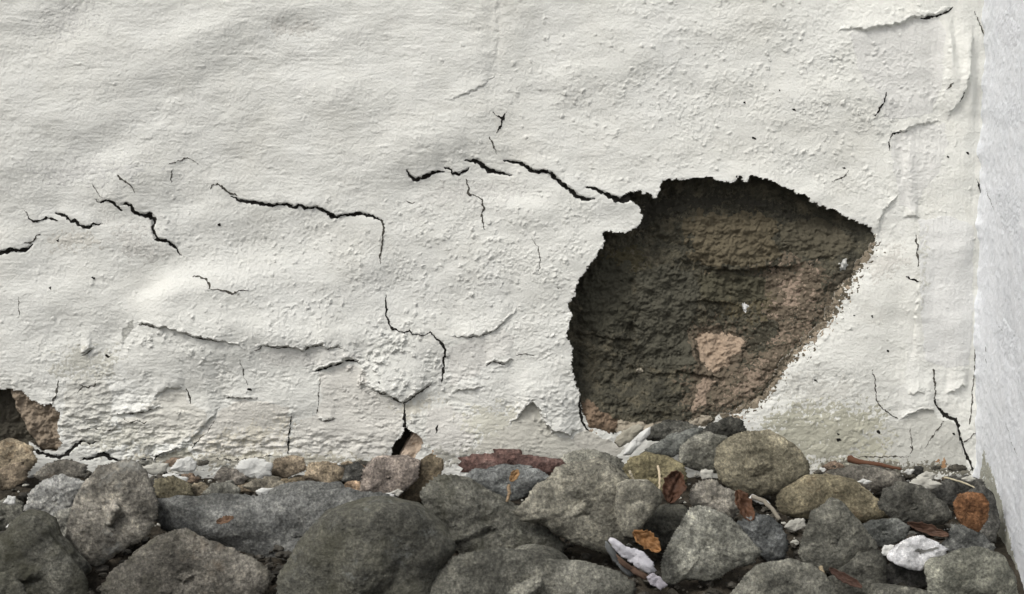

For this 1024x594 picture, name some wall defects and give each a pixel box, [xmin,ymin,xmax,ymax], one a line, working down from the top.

crack [0,174,249,295]
crack [210,183,385,264]
spalling [0,5,973,468]
crack [405,112,631,230]
crack [373,296,500,428]
crack [856,349,976,471]